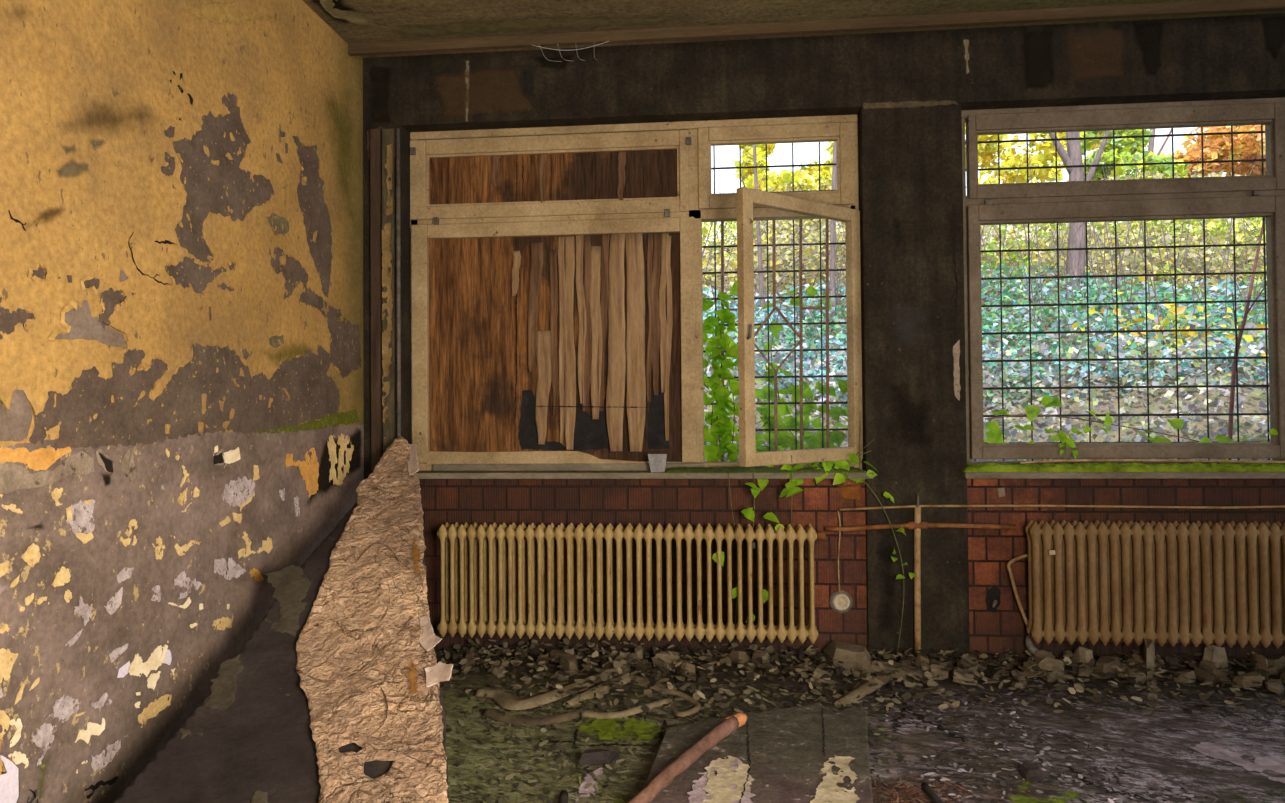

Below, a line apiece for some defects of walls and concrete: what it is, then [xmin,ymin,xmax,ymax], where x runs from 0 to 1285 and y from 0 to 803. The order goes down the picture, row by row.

peeling [0,71,362,553]
peeling [119,535,179,560]
peeling [0,561,50,612]
flaking render [0,751,29,803]